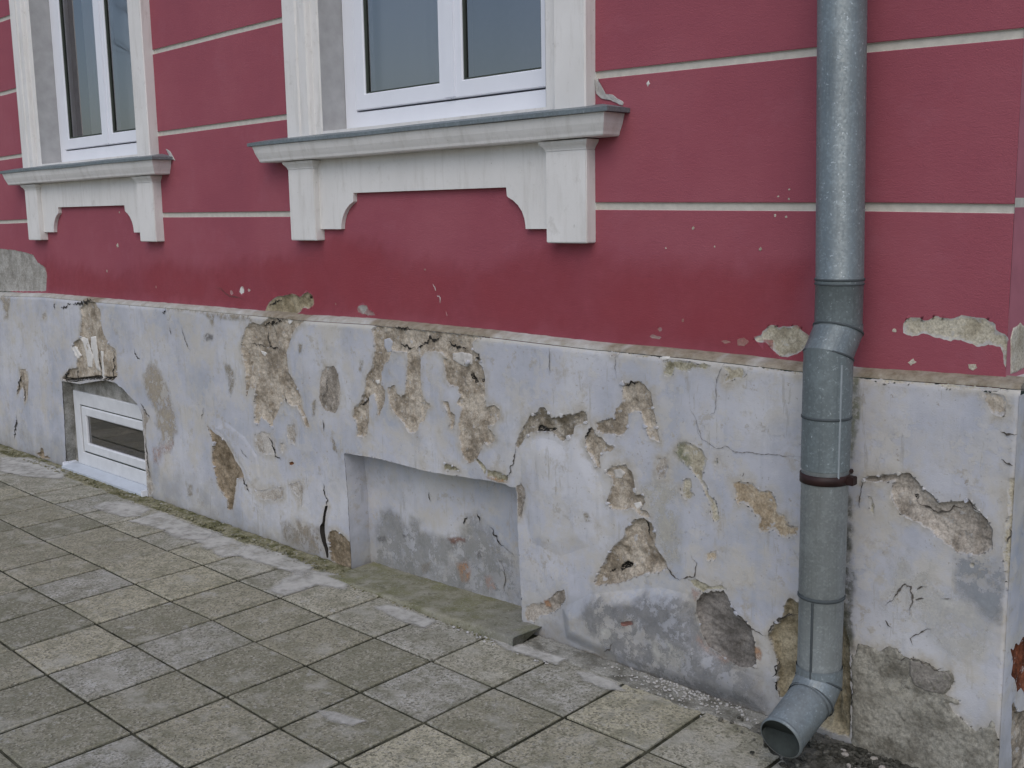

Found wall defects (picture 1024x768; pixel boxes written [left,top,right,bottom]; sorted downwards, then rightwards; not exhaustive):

flaking render [61,298,118,382]
flaking render [207,426,303,510]
flaking render [240,292,314,460]
crack [320,489,329,558]
flaking render [352,305,525,518]
flaking render [515,380,668,586]
crack [693,363,796,457]
flaking render [861,472,1015,589]
peeling [892,315,1024,374]
flaking render [688,578,799,701]
crack [885,584,949,645]
flaking render [819,624,1024,768]